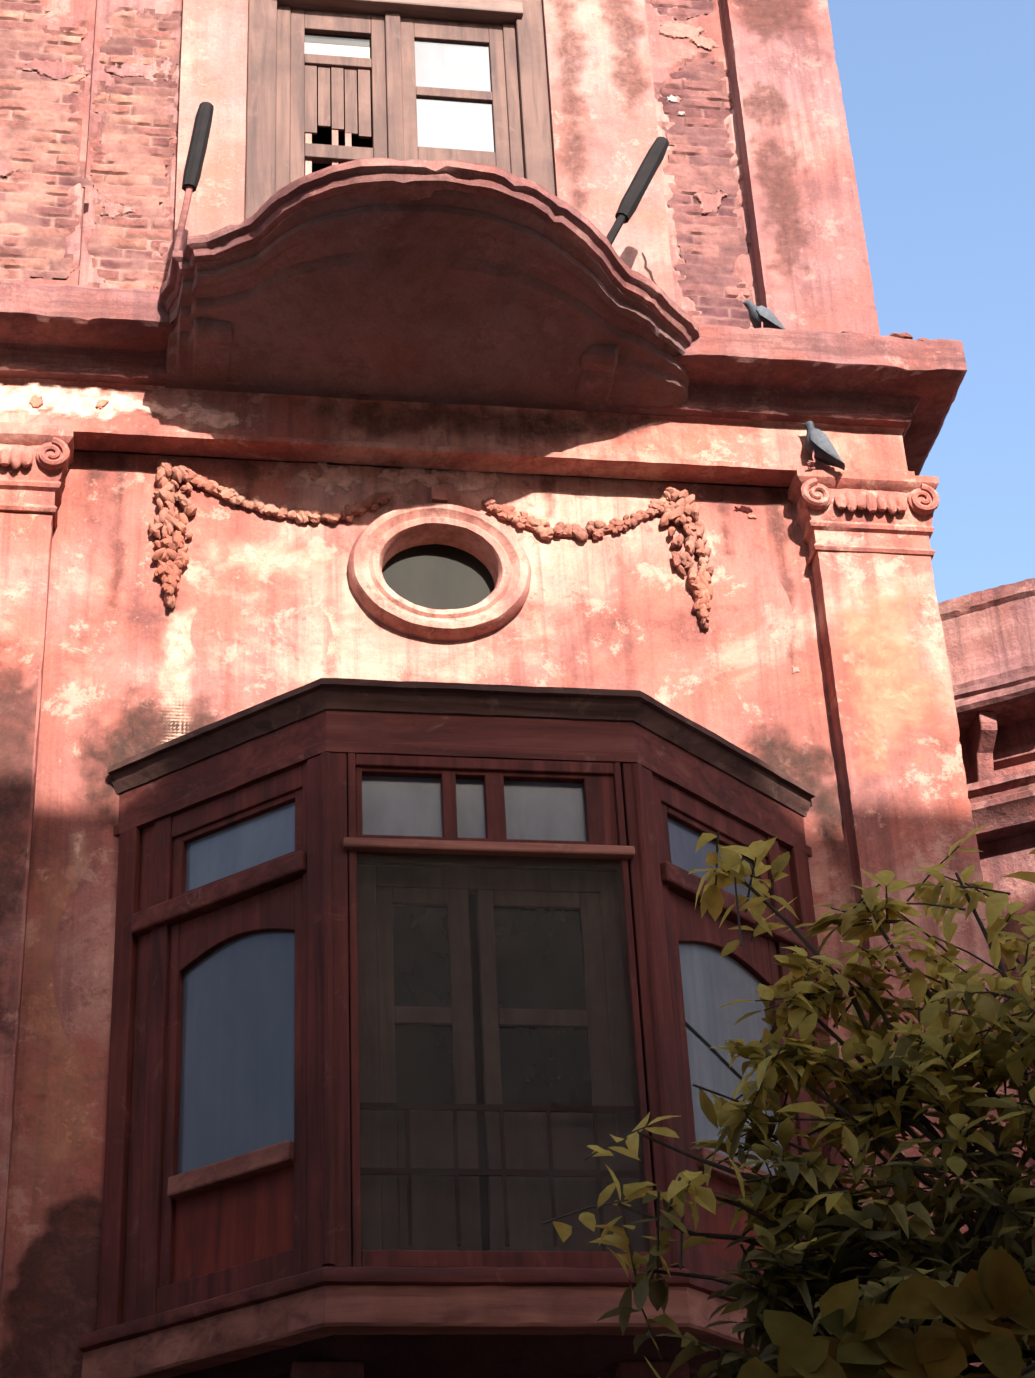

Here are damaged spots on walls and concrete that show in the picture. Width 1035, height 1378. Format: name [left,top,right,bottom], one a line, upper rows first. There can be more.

spalling [0,0,180,290]
spalling [646,0,754,329]
flaking render [0,383,238,429]
leakage [87,618,214,813]